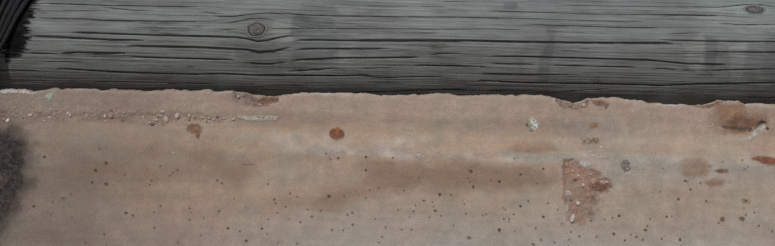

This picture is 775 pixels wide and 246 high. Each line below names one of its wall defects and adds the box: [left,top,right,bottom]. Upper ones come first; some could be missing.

corrosion [330,128,344,139]
corrosion [752,156,775,164]
spalling [562,160,612,223]